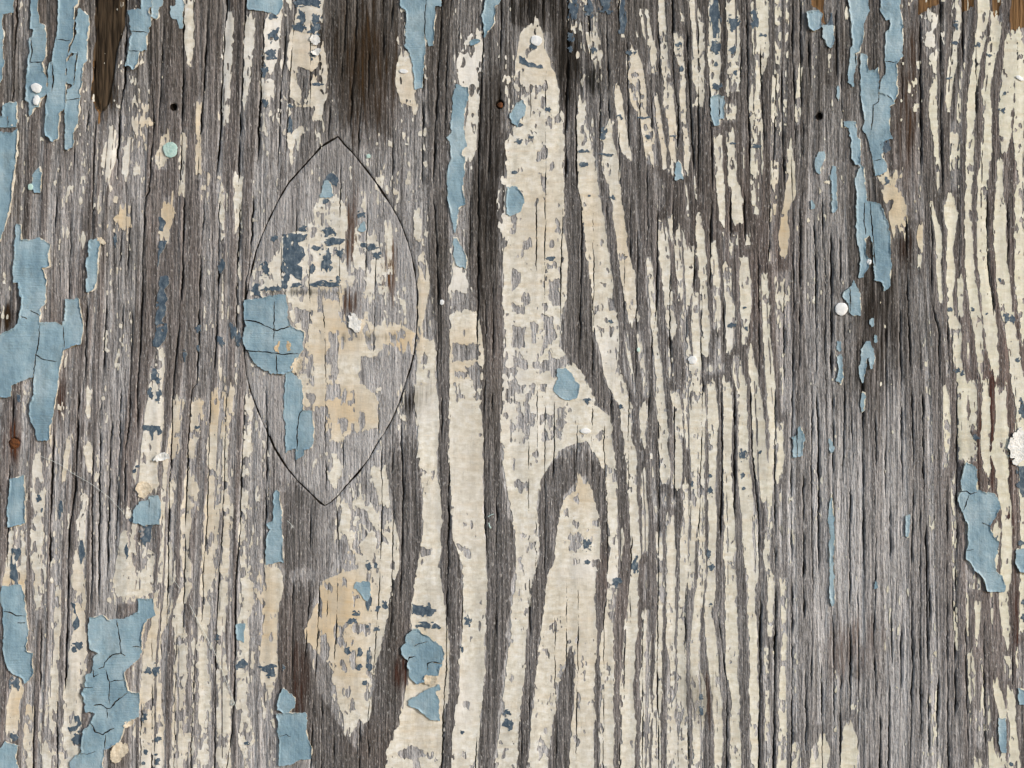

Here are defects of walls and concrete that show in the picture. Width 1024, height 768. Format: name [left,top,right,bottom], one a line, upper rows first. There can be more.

peeling [0,0,328,768]
crack [33,0,502,768]
peeling [217,173,488,768]
peeling [446,0,501,299]
peeling [807,0,1024,650]